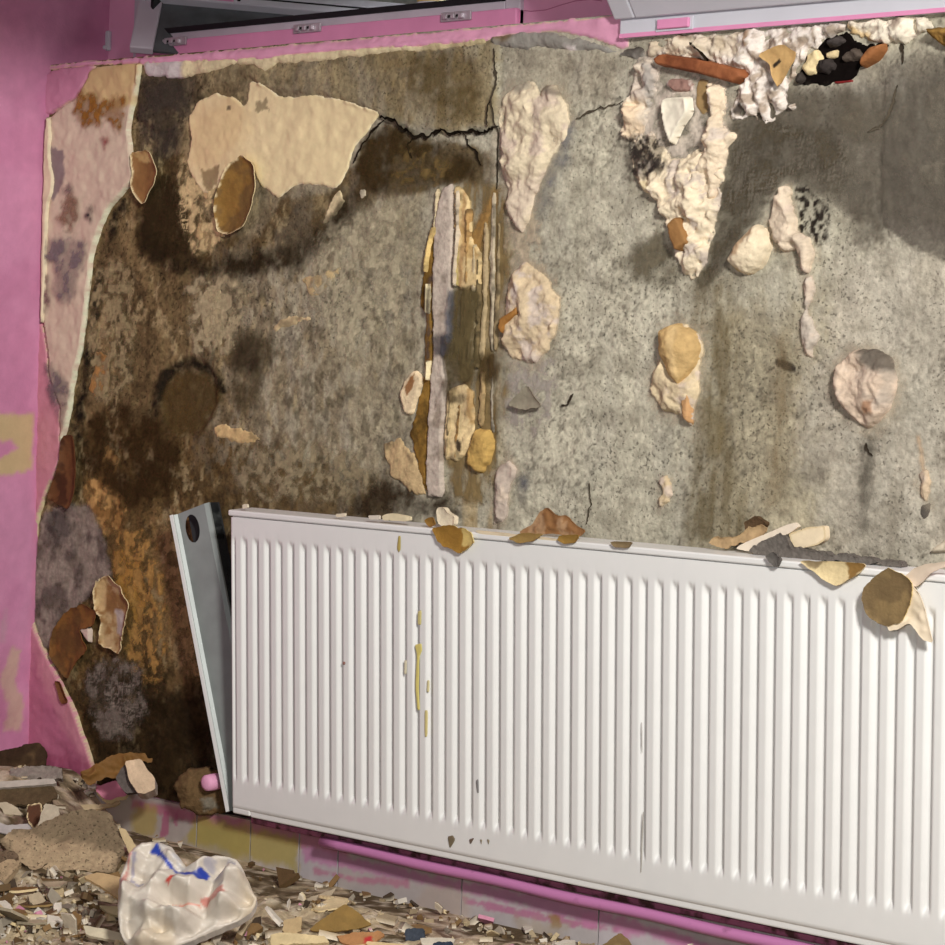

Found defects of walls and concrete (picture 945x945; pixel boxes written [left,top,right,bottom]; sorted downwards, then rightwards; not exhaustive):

damp [138,175,302,278]
damp [356,126,440,192]
crack [353,48,499,190]
peeling [40,16,945,443]
damp [697,81,945,286]
damp [75,332,270,507]
flaking render [35,504,146,739]
damp [355,482,458,517]
peeling [424,517,474,553]
peeling [801,560,866,586]
peeling [861,540,945,642]
peeling [80,752,153,790]